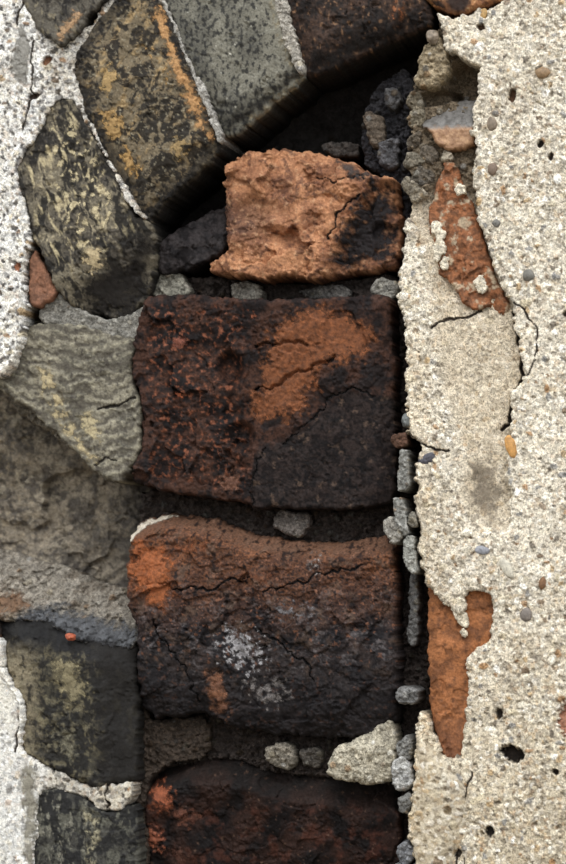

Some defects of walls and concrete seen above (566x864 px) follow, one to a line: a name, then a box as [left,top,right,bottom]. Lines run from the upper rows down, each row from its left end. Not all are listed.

crack [22,40,35,131]
crack [186,174,450,461]
crack [431,310,482,329]
spalling [401,23,525,537]
crack [512,302,538,386]
crack [500,406,513,431]
crack [139,386,431,738]
crack [153,619,354,778]
spalling [427,588,494,758]
spalling [558,700,566,737]
crack [384,781,412,841]